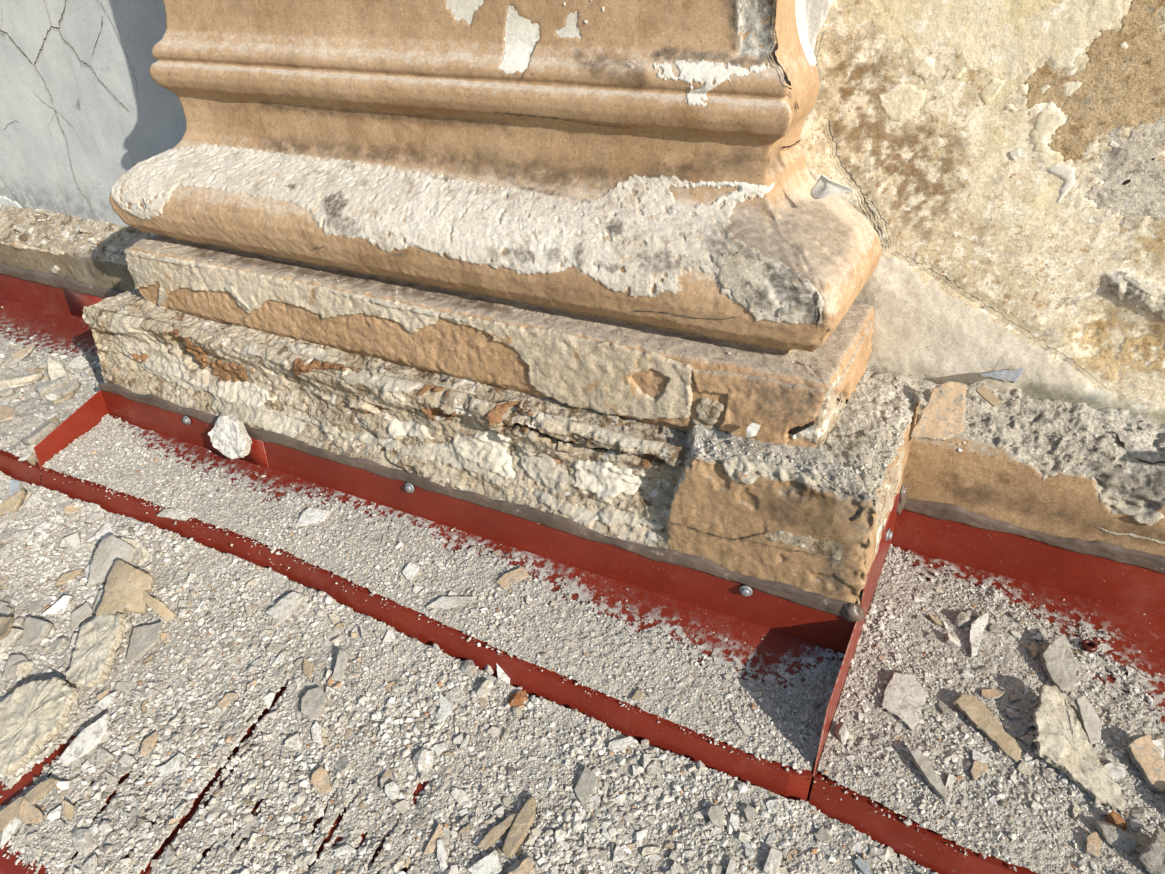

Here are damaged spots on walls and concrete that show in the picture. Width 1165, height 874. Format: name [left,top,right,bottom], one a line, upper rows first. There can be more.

peeling [446,0,484,25]
peeling [498,6,540,74]
peeling [556,2,588,39]
peeling [626,0,778,106]
flaking render [795,0,832,66]
crack [0,0,138,214]
peeling [863,0,1165,232]
peeling [111,144,824,325]
spalling [64,249,874,549]
spalling [869,375,1165,556]
flaking render [265,591,311,625]
flaking render [426,591,479,613]